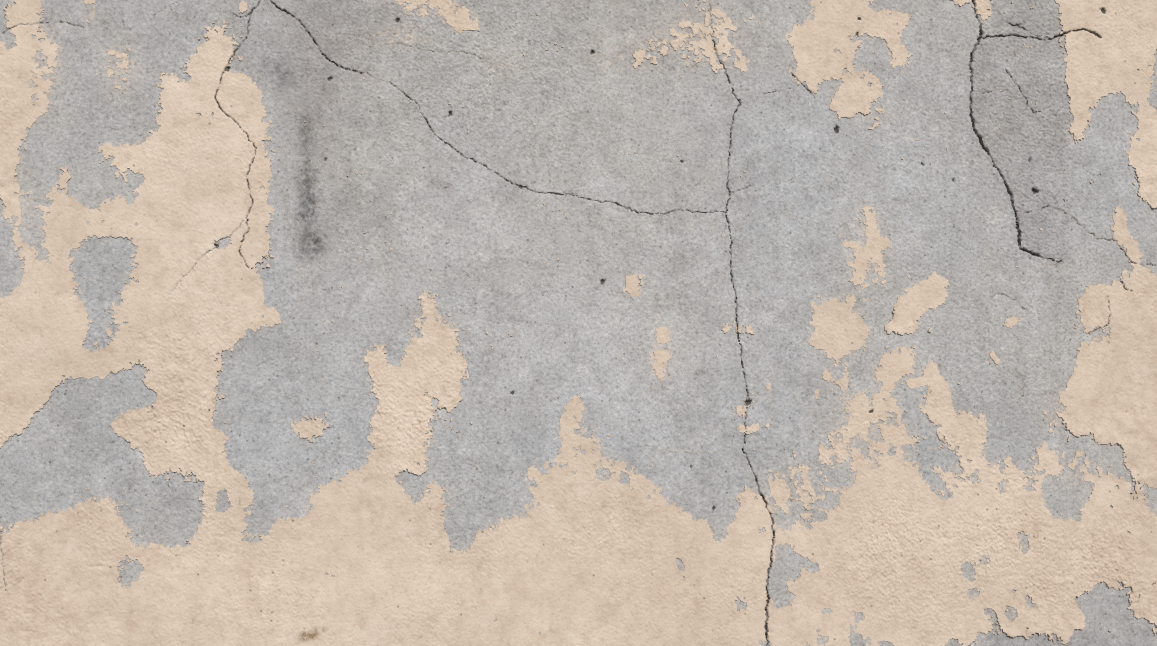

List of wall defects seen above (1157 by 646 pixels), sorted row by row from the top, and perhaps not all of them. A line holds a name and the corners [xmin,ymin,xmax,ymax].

peeling [0,0,17,50]
peeling [1147,50,1157,114]
crack [969,0,1156,334]
peeling [0,198,25,298]
peeling [214,237,232,249]
peeling [68,235,139,353]
crack [171,0,815,646]
peeling [0,360,205,548]
peeling [215,489,232,513]
peeling [961,555,990,600]
peeling [848,611,894,646]
peeling [945,581,1157,646]